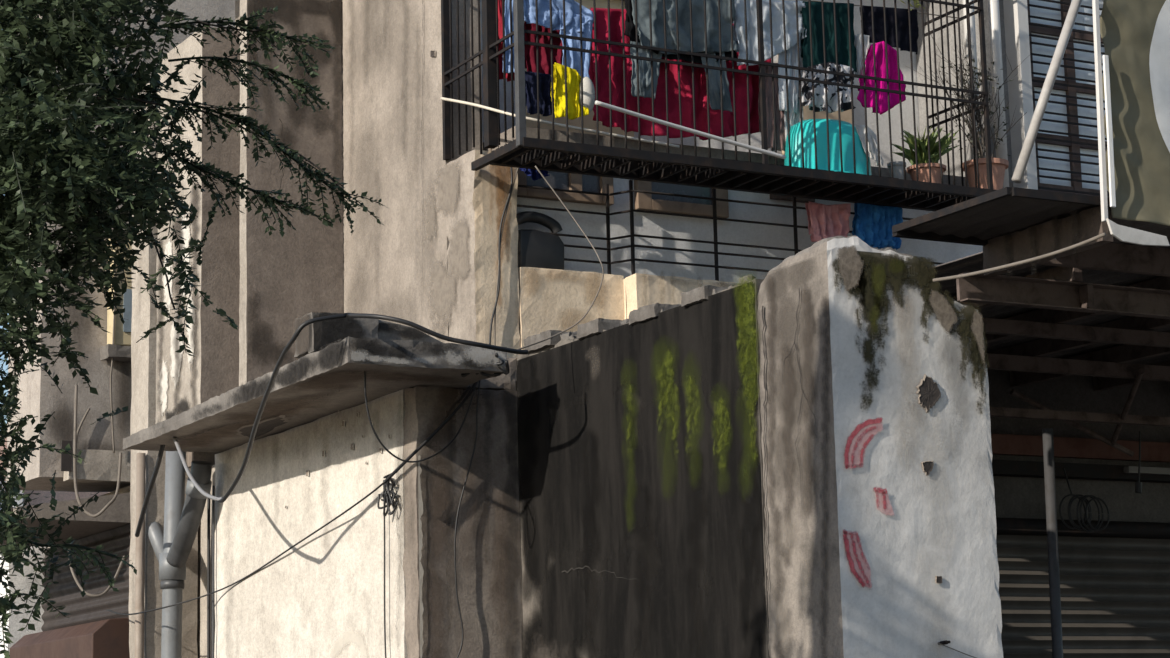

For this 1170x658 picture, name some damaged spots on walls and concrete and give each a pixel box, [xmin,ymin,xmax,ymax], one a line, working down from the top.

leakage [248,0,342,180]
leakage [832,258,842,291]
spalling [838,245,864,290]
leakage [855,254,989,414]
spalling [929,290,986,375]
leakage [52,409,74,441]
leakage [118,364,129,431]
spalling [916,374,941,413]
leakage [165,262,830,658]